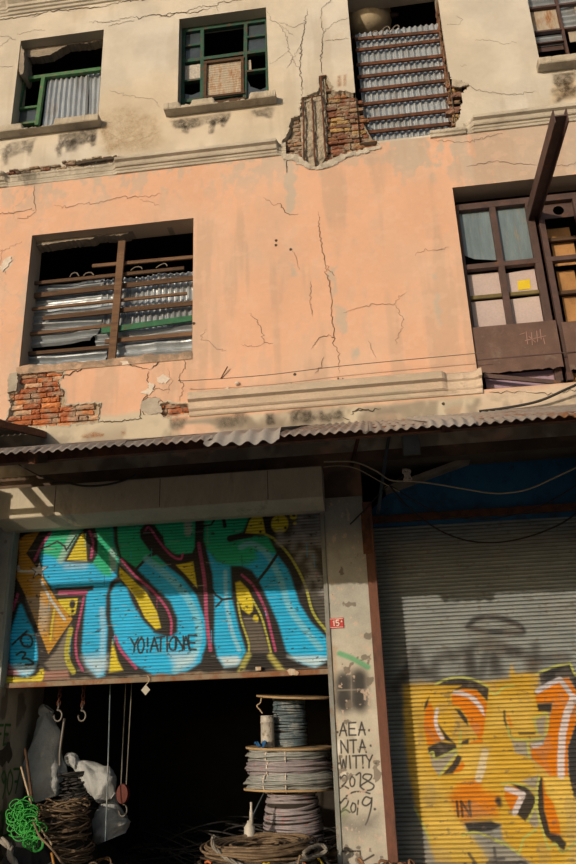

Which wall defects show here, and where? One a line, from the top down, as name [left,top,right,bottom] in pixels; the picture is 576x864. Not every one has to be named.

crack [0,0,237,41]
crack [267,2,349,95]
flaking render [280,75,381,170]
flaking render [6,155,118,175]
crack [294,213,404,372]
flaking render [5,370,103,429]
flaking render [140,374,189,419]
leakage [291,410,342,422]